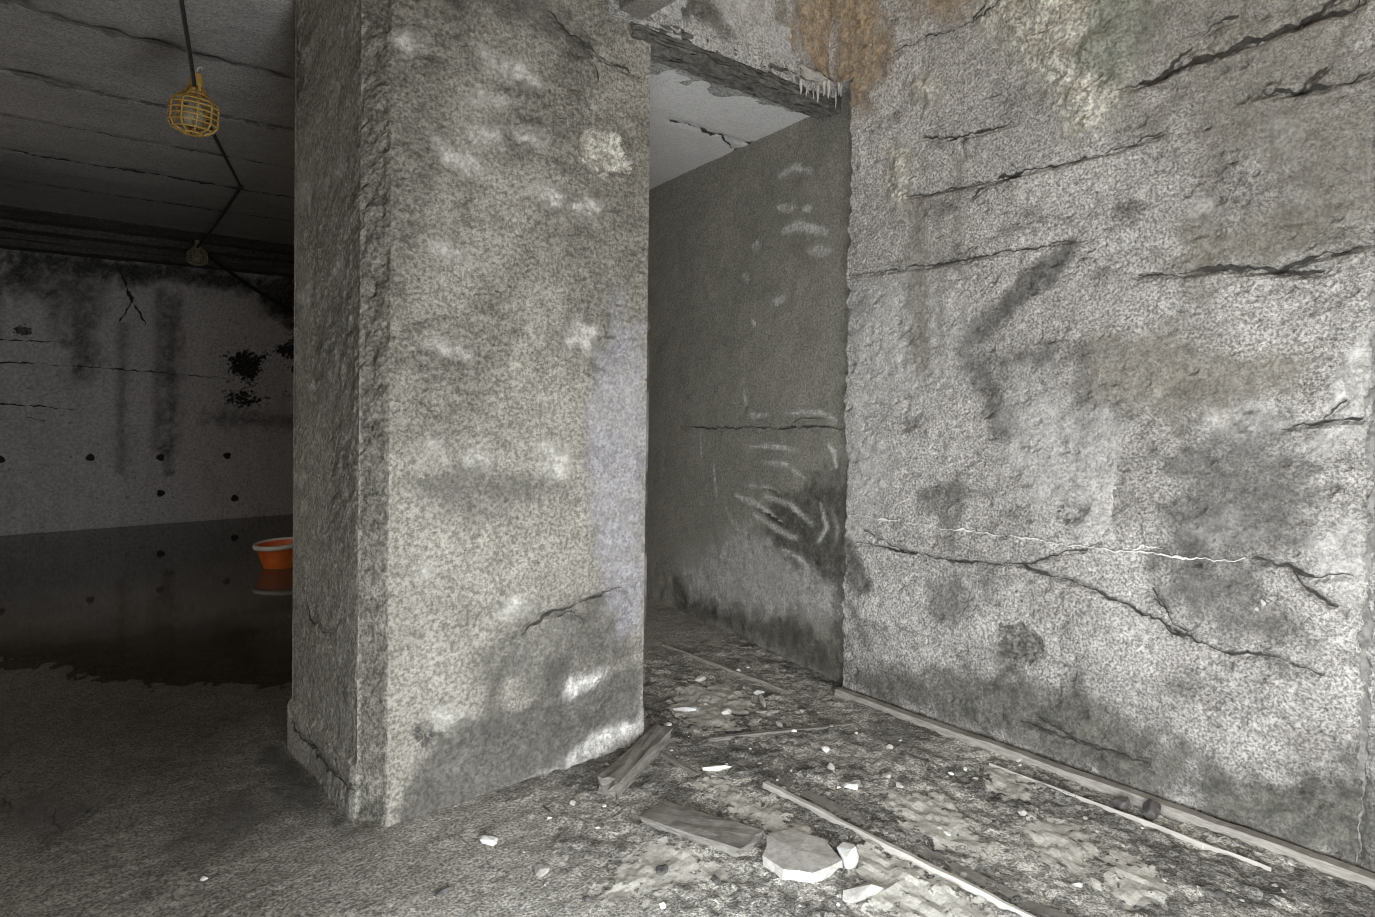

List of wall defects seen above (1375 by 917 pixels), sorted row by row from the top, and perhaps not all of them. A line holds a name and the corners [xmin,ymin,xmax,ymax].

crack [894,0,1000,52]
crack [1114,0,1360,91]
crack [1264,68,1370,96]
crack [922,122,1015,151]
crack [906,132,1162,198]
crack [849,241,1072,276]
crack [1138,232,1375,277]
water stain [0,249,294,383]
crack [849,291,1375,863]
crack [512,587,620,639]